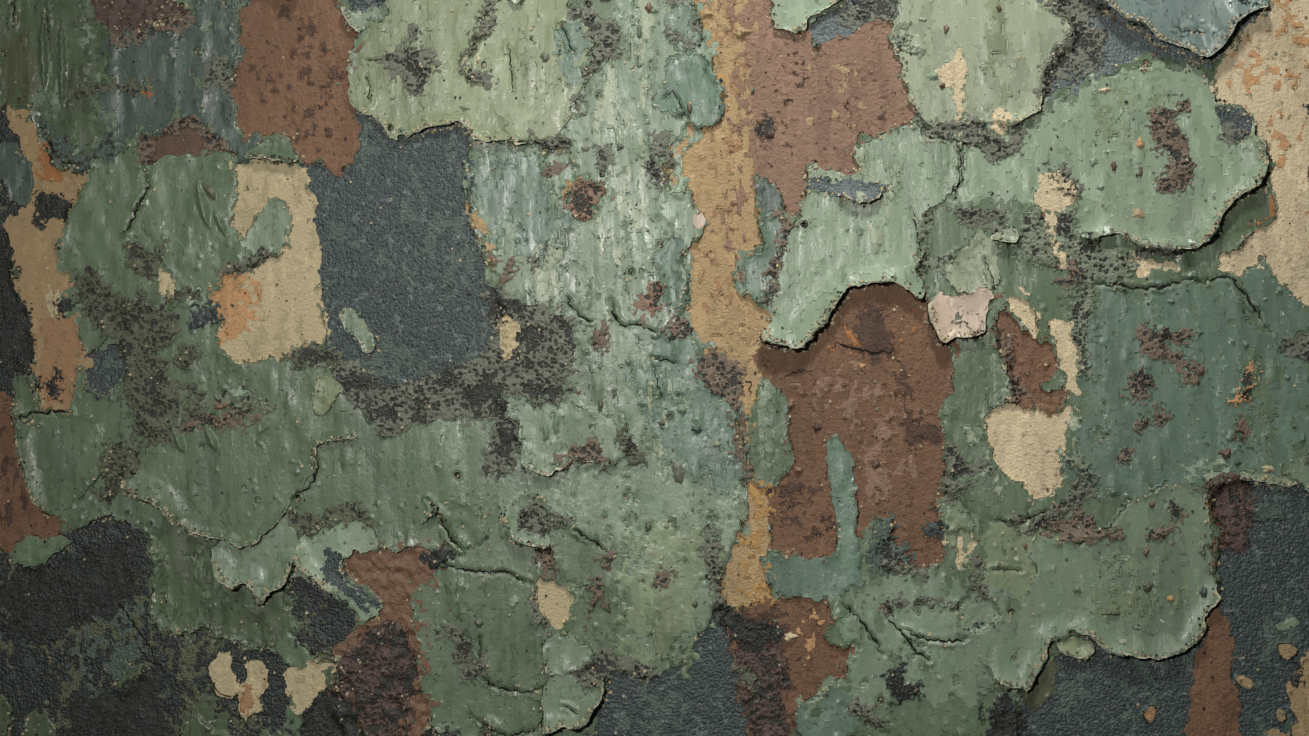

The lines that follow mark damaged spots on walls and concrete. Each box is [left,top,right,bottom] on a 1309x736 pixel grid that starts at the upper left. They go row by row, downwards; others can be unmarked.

spalling [0,0,631,736]
spalling [467,0,1309,736]